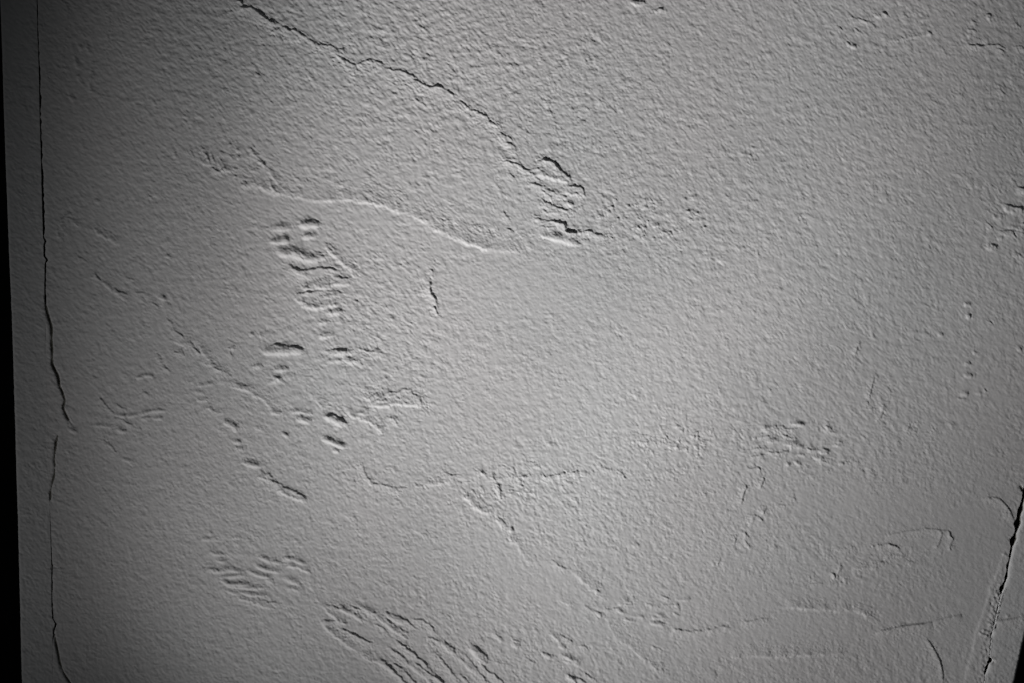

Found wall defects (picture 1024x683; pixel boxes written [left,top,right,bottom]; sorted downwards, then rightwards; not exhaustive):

crack [226,0,521,157]
crack [37,0,78,683]
crack [977,481,1024,675]